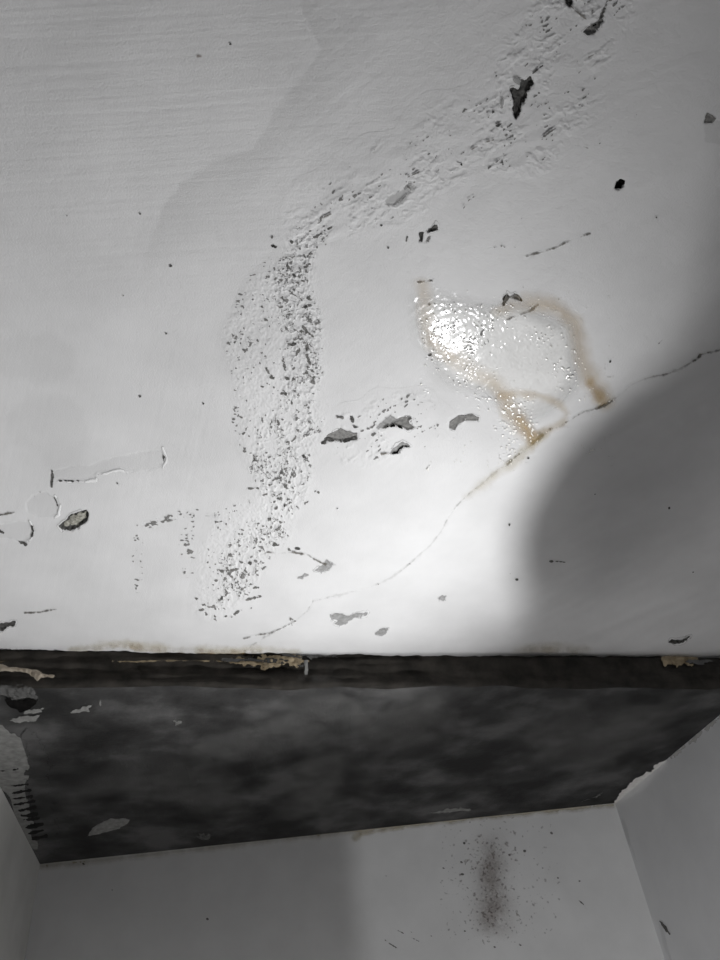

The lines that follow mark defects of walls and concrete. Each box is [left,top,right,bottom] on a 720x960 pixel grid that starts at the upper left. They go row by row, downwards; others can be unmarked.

spalling [565,0,607,37]
spalling [500,65,543,119]
spalling [406,221,440,242]
damp [420,292,615,468]
peeling [321,417,358,444]
peeling [377,416,415,455]
peeling [449,413,481,432]
spalling [51,469,125,532]
peeling [267,544,333,579]
spalling [330,610,370,627]
spalling [0,685,38,713]
flaking render [0,725,38,850]